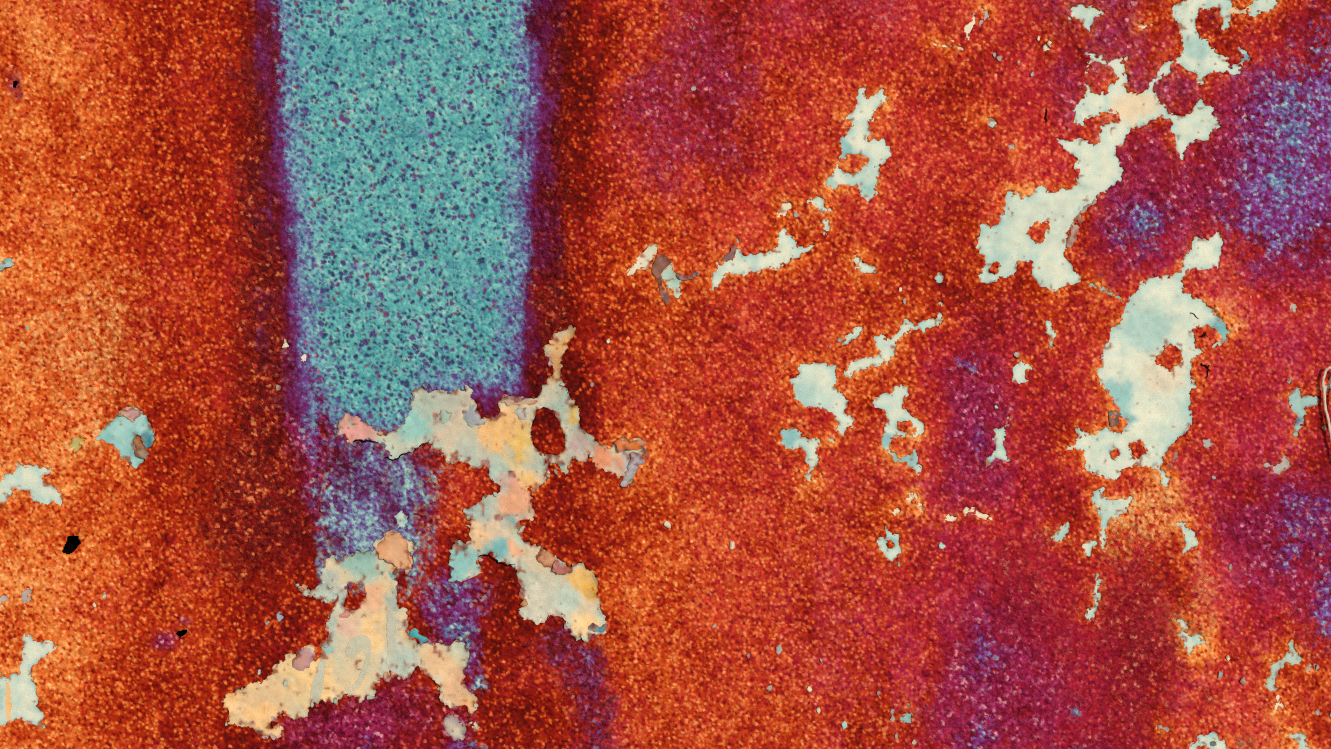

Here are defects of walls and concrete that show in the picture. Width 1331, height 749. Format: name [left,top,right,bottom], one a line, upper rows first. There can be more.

peeling [0,462,62,508]
corrosion [23,275,150,436]
peeling [70,407,155,468]
corrosion [188,0,316,579]
peeling [334,325,649,642]
corrosion [537,0,569,372]
peeling [627,87,892,305]
peeling [780,302,943,481]
peeling [976,0,1278,556]
peeling [0,633,58,728]
peeling [221,510,480,741]
corrosion [1075,477,1197,749]